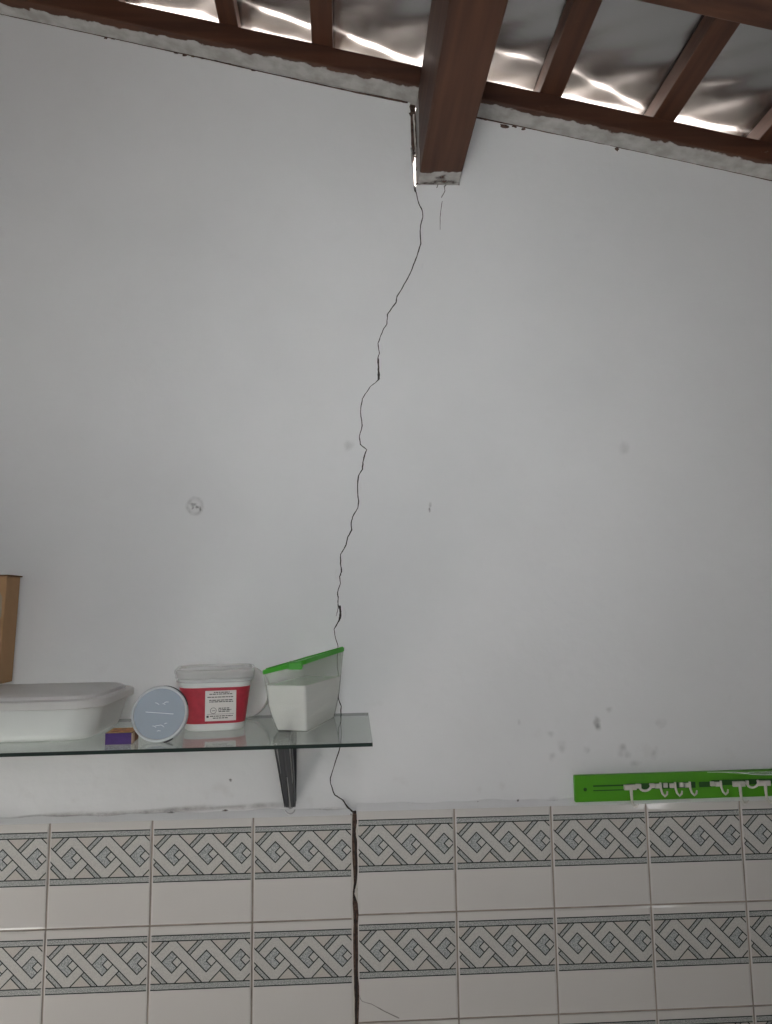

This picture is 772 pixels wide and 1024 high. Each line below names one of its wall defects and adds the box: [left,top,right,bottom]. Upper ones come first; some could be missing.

crack [330,184,446,1024]